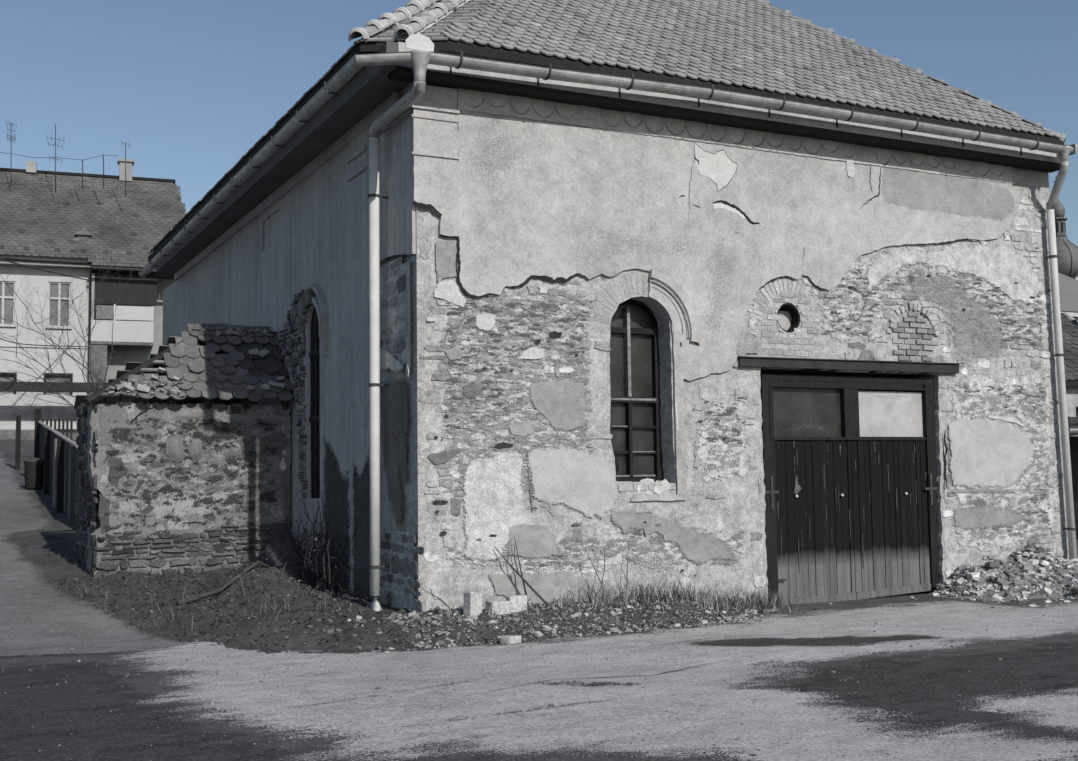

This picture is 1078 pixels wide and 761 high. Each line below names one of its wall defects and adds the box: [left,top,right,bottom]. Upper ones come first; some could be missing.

crack [680,142,760,234]
flaking render [694,144,747,220]
spalling [376,209,765,614]
spalling [824,190,1066,580]
flaking render [108,458,143,494]
spalling [91,494,287,578]